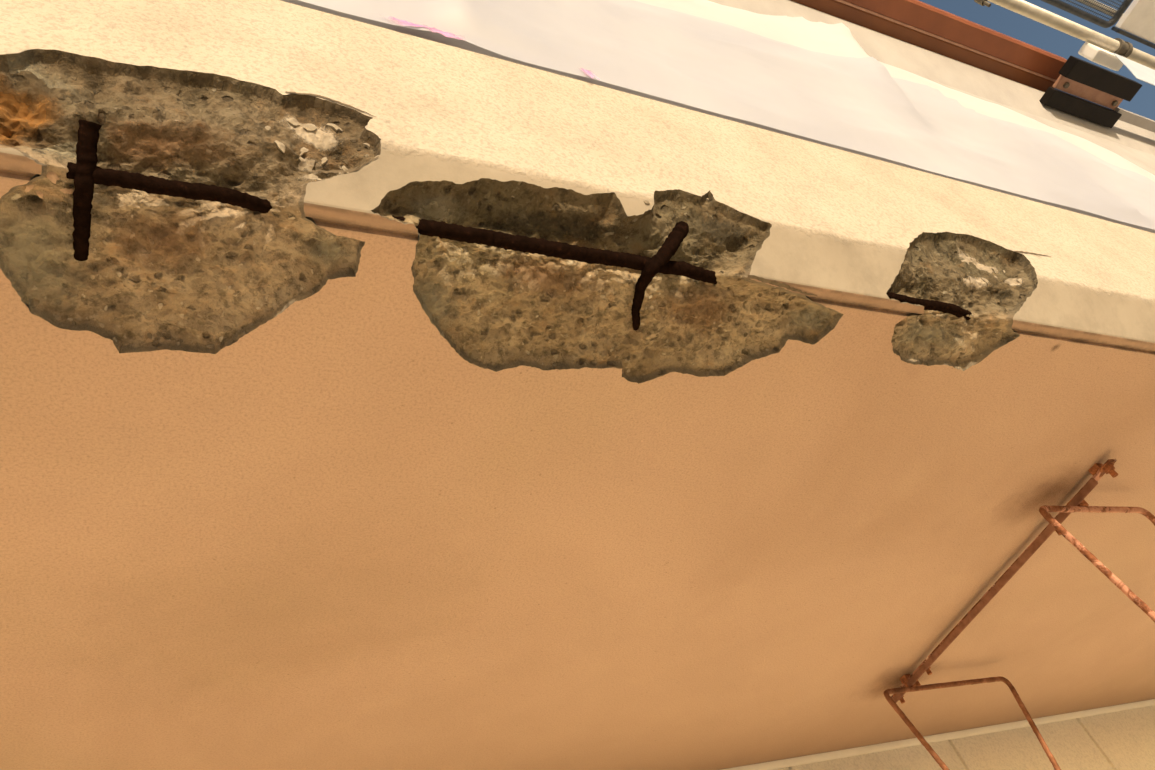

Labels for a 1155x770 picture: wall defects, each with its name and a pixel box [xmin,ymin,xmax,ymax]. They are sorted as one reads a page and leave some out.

spalling [0,49,381,354]
spalling [371,178,843,384]
spalling [886,232,1038,371]